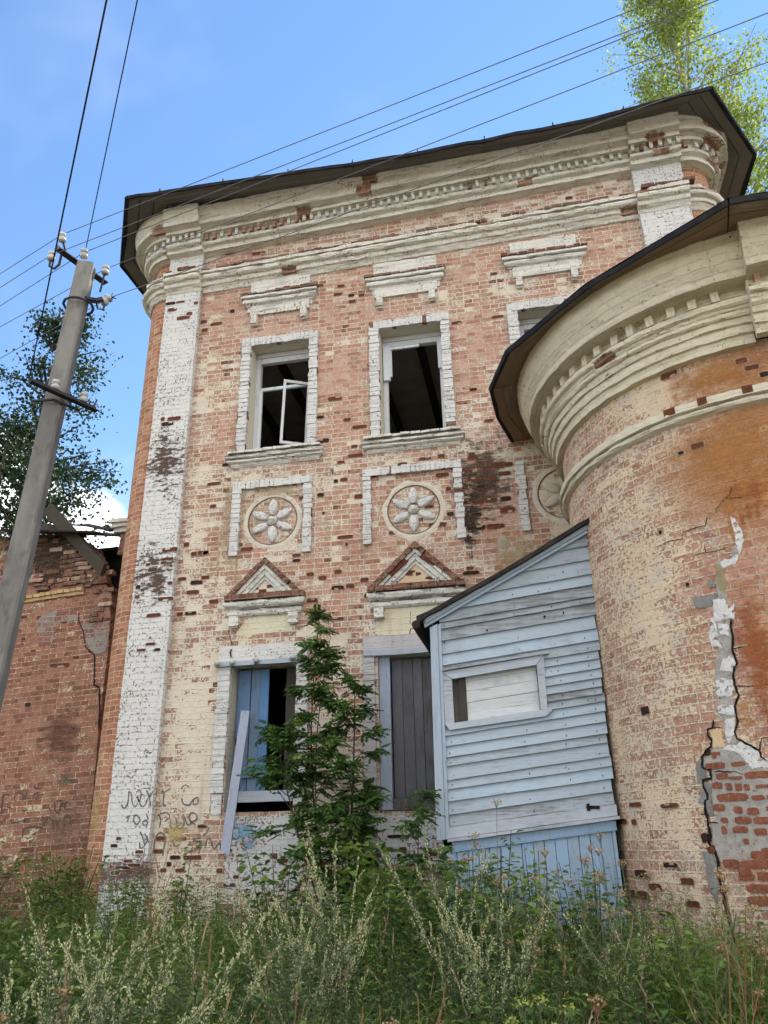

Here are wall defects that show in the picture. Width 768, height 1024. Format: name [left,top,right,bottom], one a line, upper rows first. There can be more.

damp [143,430,187,493]
damp [464,494,476,557]
crack [659,487,742,555]
damp [131,541,176,605]
crack [78,615,100,728]
flaking render [662,579,768,906]